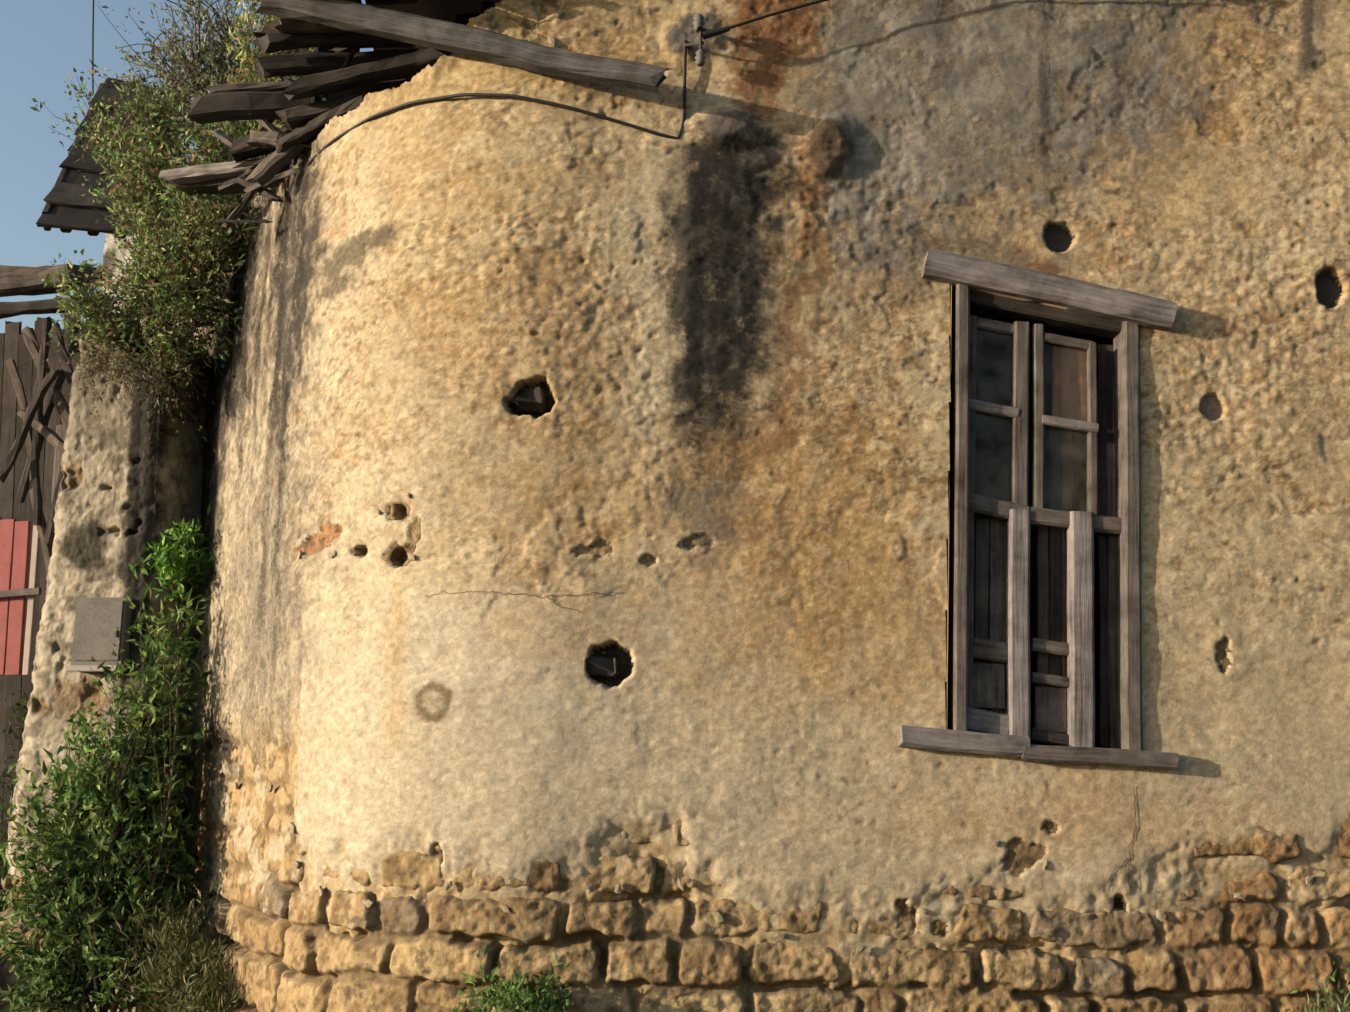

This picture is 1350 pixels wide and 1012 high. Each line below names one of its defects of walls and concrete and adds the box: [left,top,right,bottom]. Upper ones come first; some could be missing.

corrosion [724,0,823,120]
leakage [1297,0,1323,69]
leakage [795,0,1214,294]
spalling [1044,224,1075,253]
leakage [658,126,795,447]
spalling [1316,271,1343,309]
spalling [508,382,554,419]
leakage [197,139,396,778]
spalling [297,492,421,567]
crack [426,590,624,613]
spalling [586,644,633,687]
crack [1103,786,1137,894]